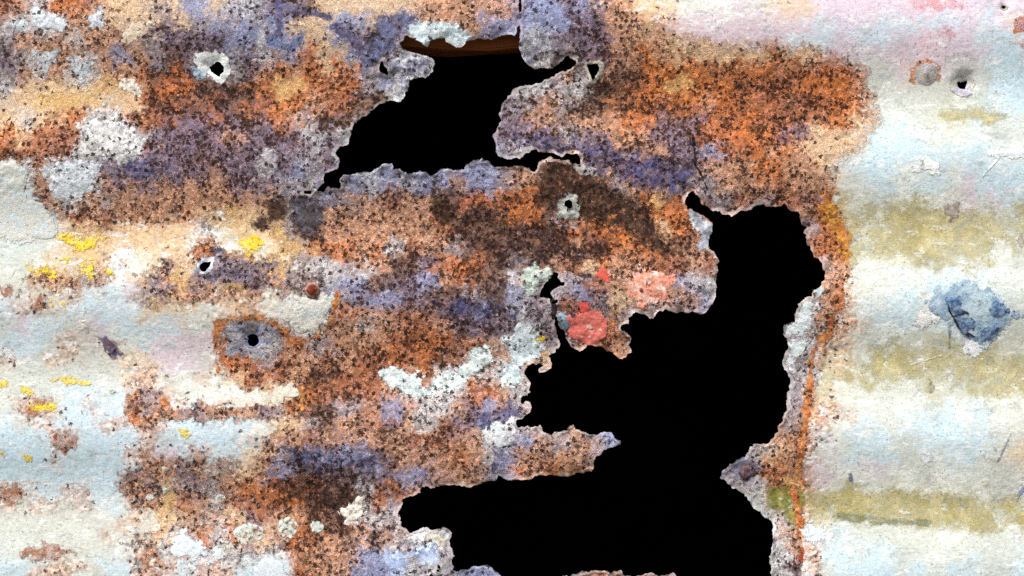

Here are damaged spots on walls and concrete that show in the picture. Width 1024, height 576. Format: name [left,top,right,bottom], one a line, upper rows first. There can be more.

peeling [190,49,230,85]
peeling [374,19,473,101]
corrosion [0,0,520,240]
corrosion [0,264,108,313]
peeling [195,242,253,287]
corrosion [114,0,884,576]
corrosion [98,336,124,359]
peeling [221,292,335,363]
peeling [378,322,546,400]
peeling [785,286,824,371]
peeling [481,416,516,449]
peeling [381,533,447,576]